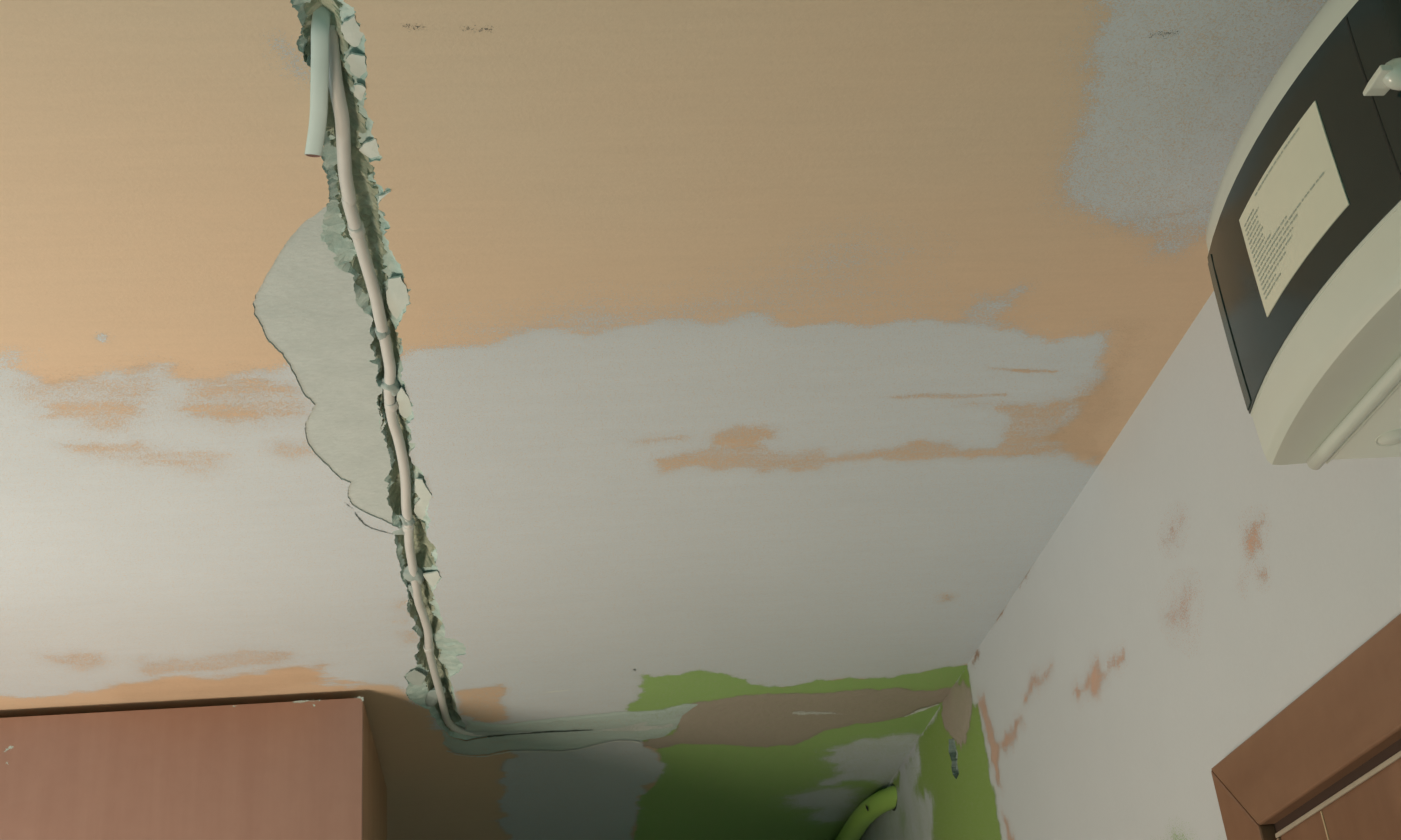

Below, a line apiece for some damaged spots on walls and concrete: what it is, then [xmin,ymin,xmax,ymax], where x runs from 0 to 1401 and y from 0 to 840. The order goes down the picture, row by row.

peeling [253,0,486,740]